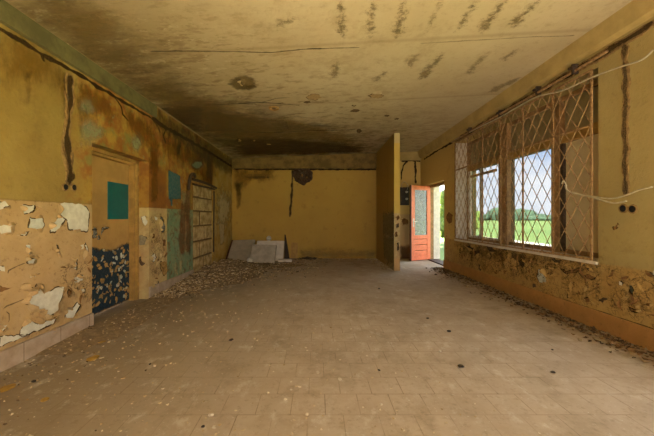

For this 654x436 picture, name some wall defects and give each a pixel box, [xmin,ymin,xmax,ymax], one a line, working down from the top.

peeling [0,202,129,347]
peeling [139,211,168,279]
crack [0,27,376,171]
leakage [39,0,361,244]
spalling [293,168,313,186]
peeling [458,244,654,316]